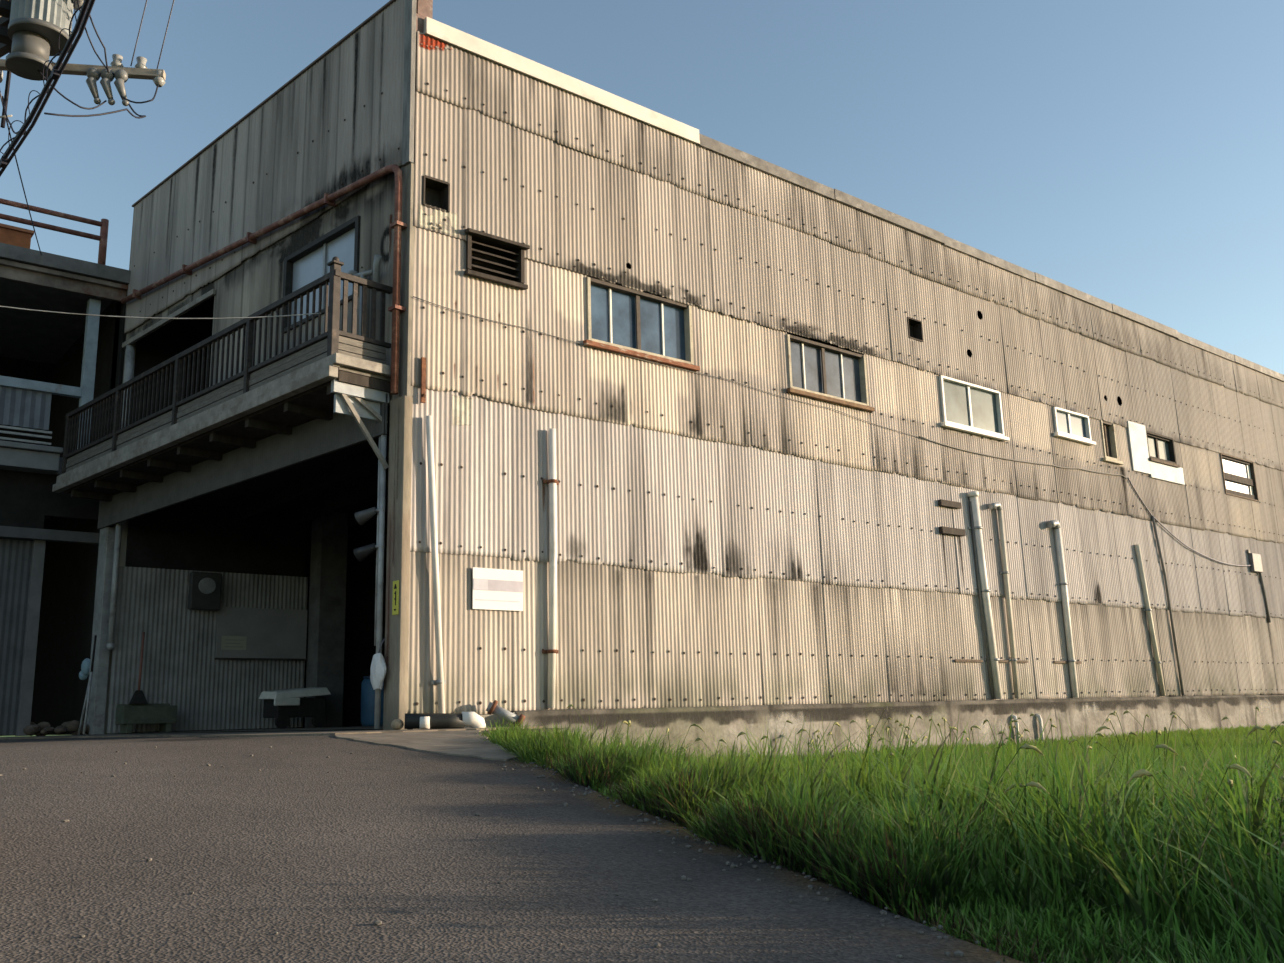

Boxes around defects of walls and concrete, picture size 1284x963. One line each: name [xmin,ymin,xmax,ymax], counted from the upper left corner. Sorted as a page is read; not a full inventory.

water stain [272,159,384,293]
corrosion [380,215,392,262]
water stain [601,389,626,422]
water stain [685,532,708,585]